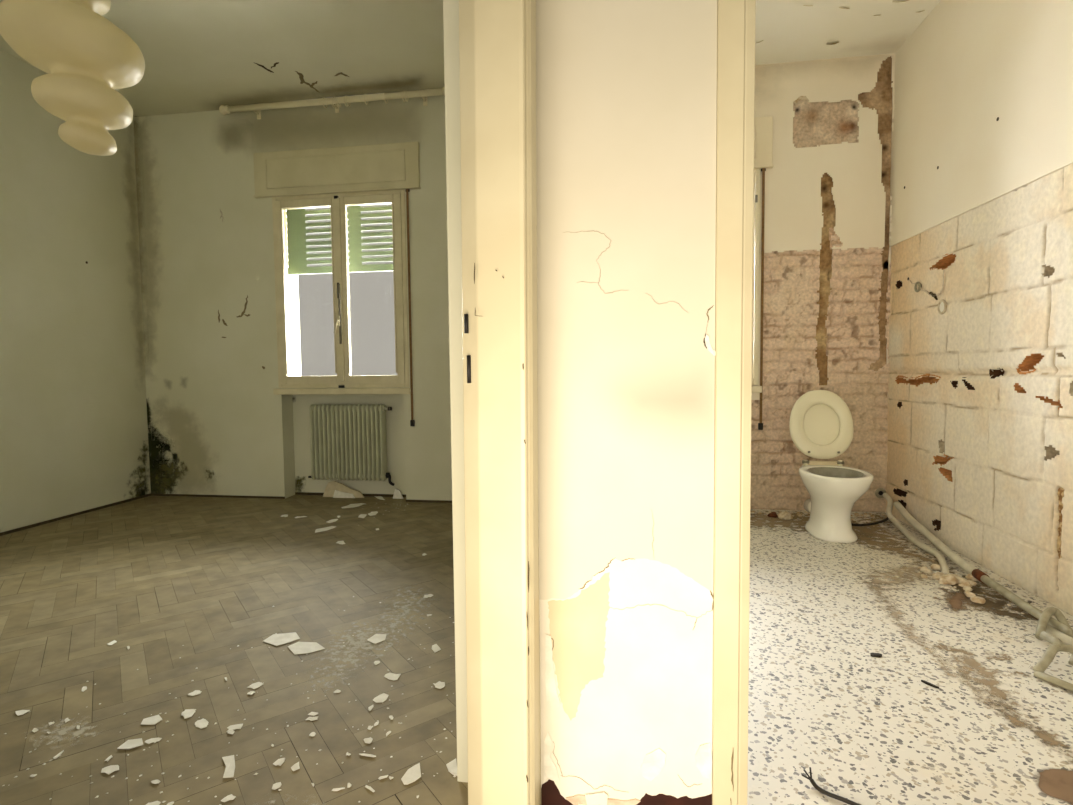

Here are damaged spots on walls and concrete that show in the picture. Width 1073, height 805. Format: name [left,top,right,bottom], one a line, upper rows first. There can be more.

spalling [793,96,859,148]
crack [564,231,714,334]
flaking render [750,163,1073,616]
leakage [130,399,187,498]
peeling [527,557,714,805]